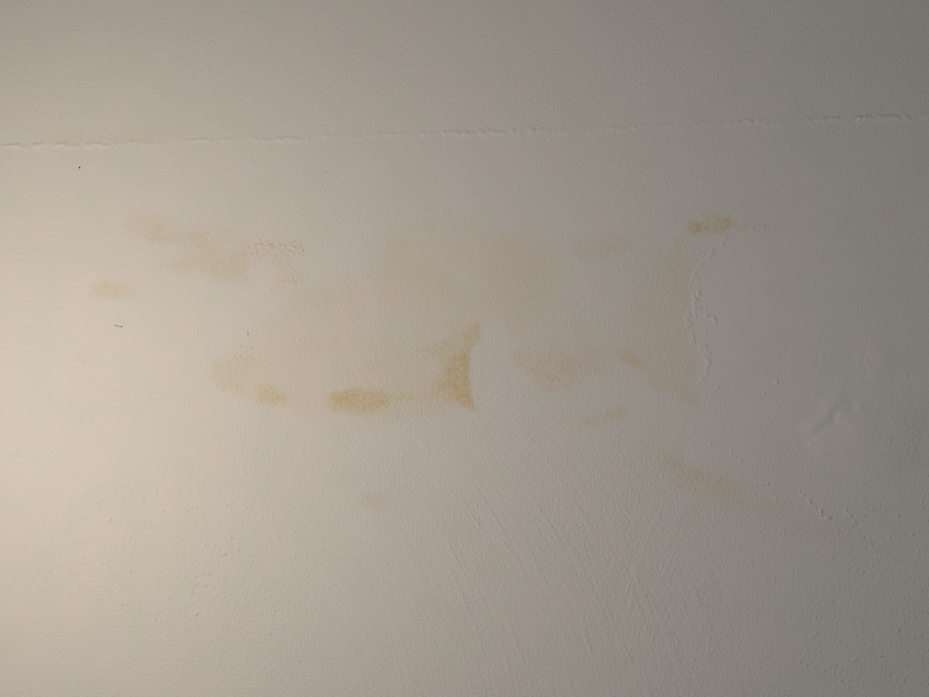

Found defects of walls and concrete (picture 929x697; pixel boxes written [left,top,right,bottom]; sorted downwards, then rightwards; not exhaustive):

damp [117,202,258,294]
damp [204,211,615,430]